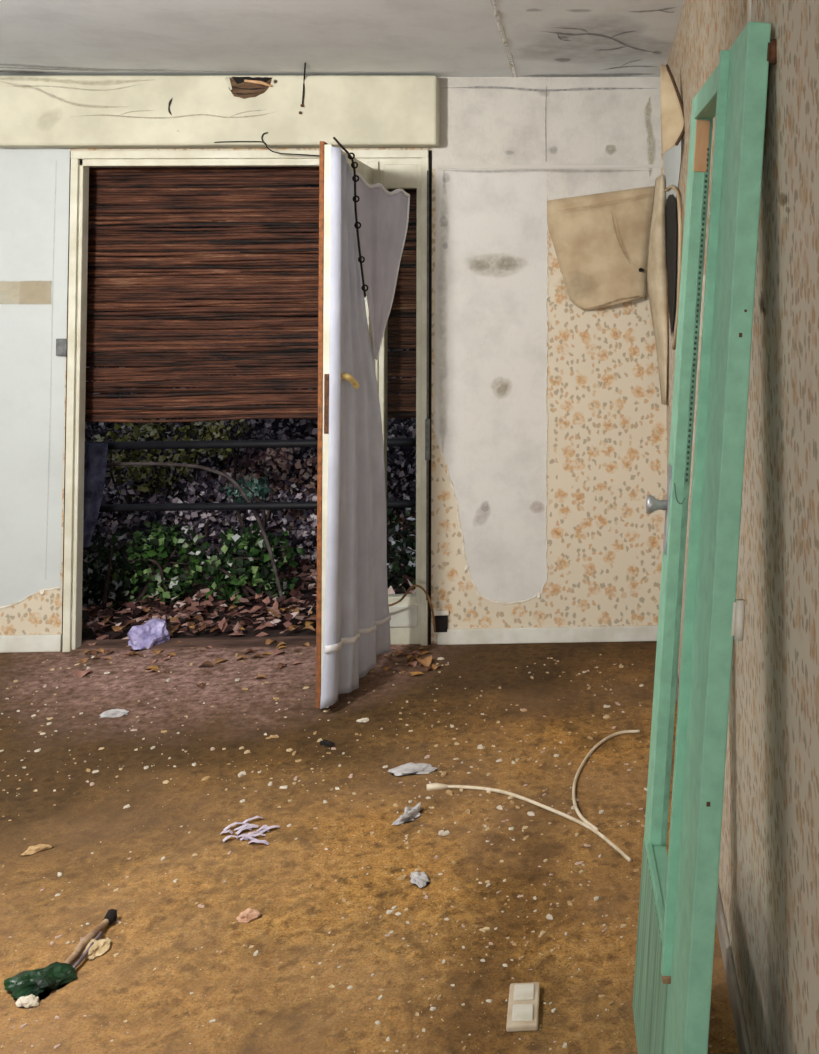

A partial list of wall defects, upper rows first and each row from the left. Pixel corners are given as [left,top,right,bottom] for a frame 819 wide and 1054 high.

crack [544,9,672,69]
spalling [225,77,272,99]